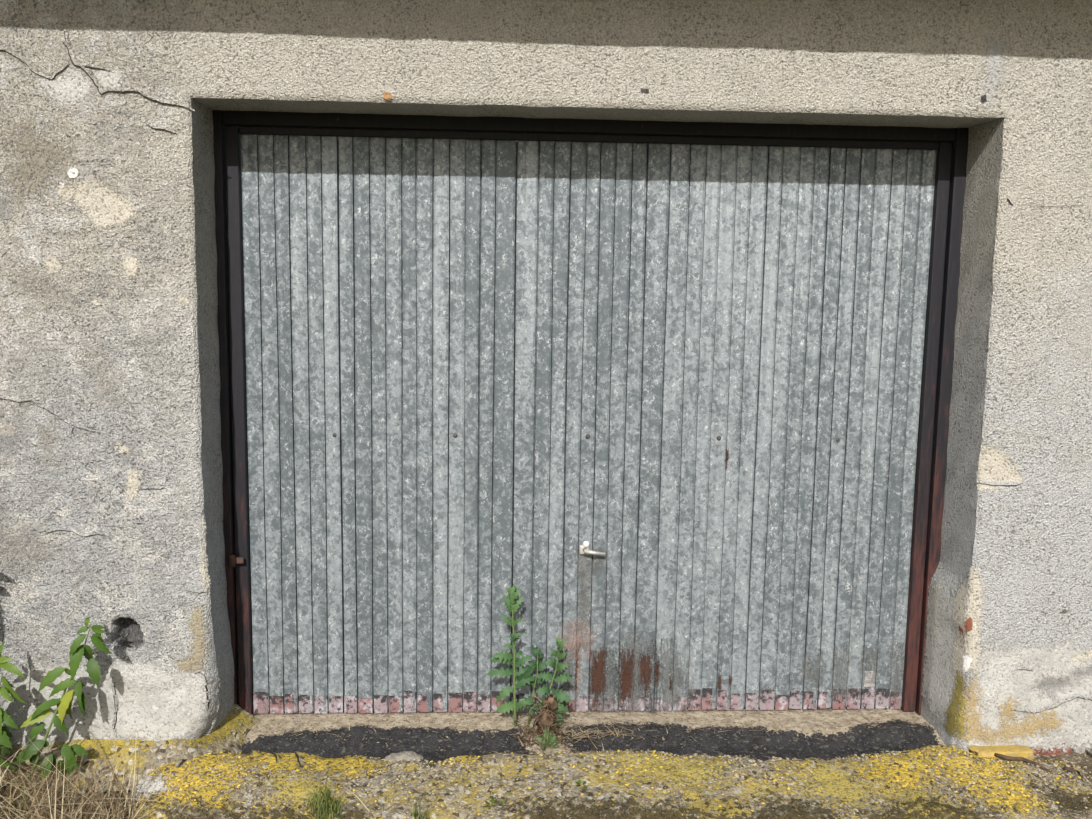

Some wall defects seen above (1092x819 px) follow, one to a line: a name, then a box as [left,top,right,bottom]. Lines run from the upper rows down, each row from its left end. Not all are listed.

crack [0,23,195,133]
corrosion [564,625,672,708]
flaking render [599,568,1092,819]
crack [1011,693,1092,713]
spalling [132,751,598,819]